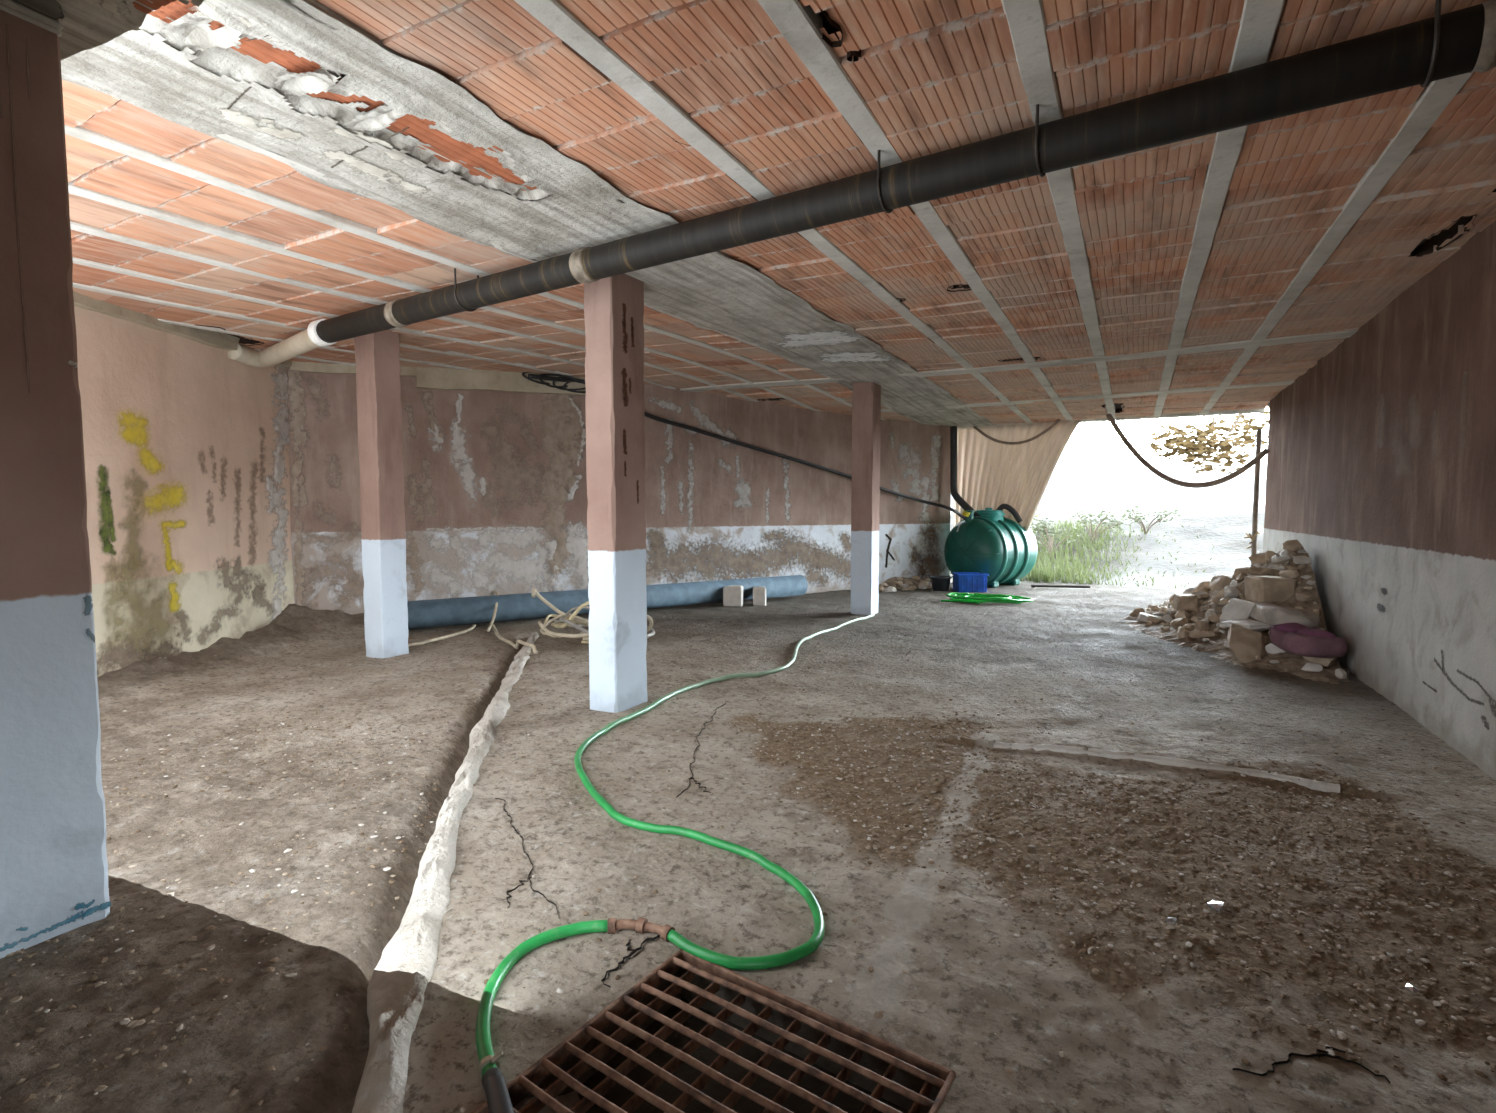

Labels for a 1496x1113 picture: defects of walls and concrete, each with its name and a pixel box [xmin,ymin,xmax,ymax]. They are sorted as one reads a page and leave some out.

spalling [124,0,551,200]
peeling [406,392,553,598]
leakage [107,479,170,656]
peeling [646,529,851,587]
crack [677,703,726,797]
crack [495,798,560,919]
crack [1233,1046,1390,1083]